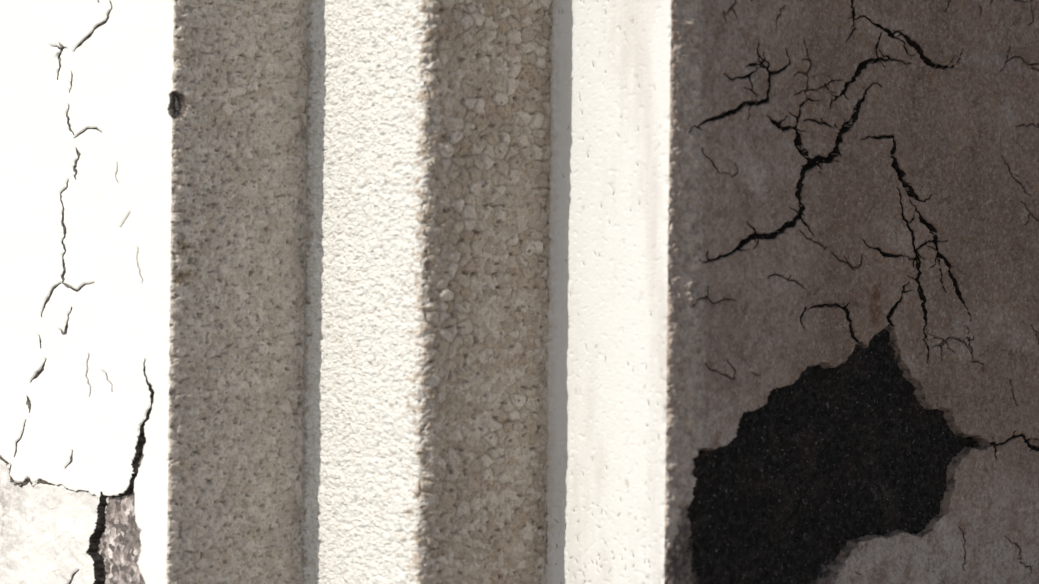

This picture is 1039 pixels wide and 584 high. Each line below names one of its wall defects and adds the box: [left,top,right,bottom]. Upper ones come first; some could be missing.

crack [1000,47,1039,72]
crack [689,0,984,372]
crack [1002,156,1039,225]
crack [14,0,113,457]
crack [705,360,759,380]
flaking render [679,324,989,584]
crack [977,431,1039,460]
flaking render [0,435,146,584]
crack [1004,536,1032,572]